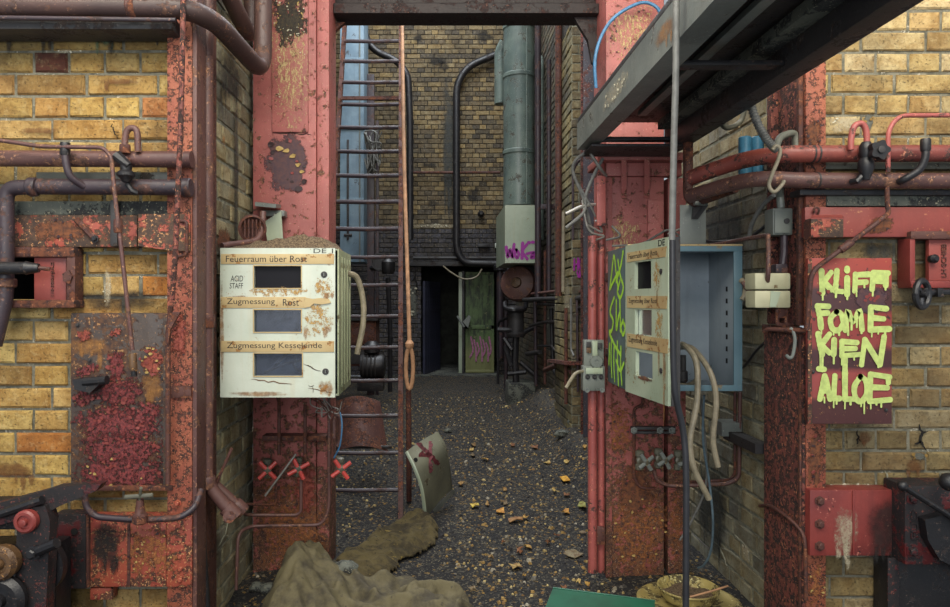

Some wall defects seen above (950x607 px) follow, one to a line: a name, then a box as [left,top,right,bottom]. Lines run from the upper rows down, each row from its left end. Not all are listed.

peeling [264,0,310,192]
crack [915,424,928,450]
corrosion [94,527,178,578]
corrosion [253,477,330,569]
corrosion [612,472,683,576]
water stain [835,517,852,564]